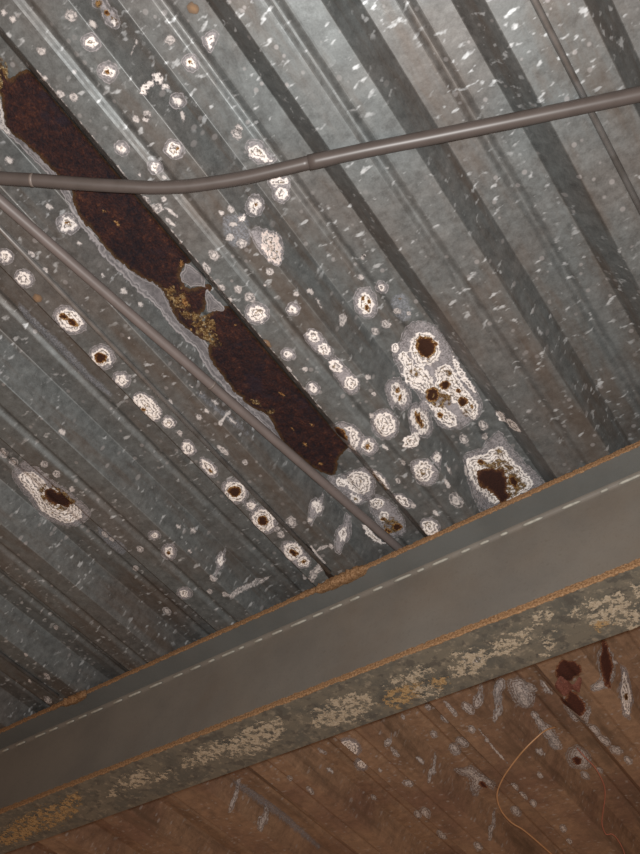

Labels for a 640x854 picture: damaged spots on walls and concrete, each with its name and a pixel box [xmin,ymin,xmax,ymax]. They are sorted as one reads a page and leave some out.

rust [0,60,130,179]
rust [138,139,185,180]
rust [139,72,187,121]
rust [231,124,277,164]
rust [269,176,290,204]
rust [0,189,640,733]
rust [0,558,640,817]